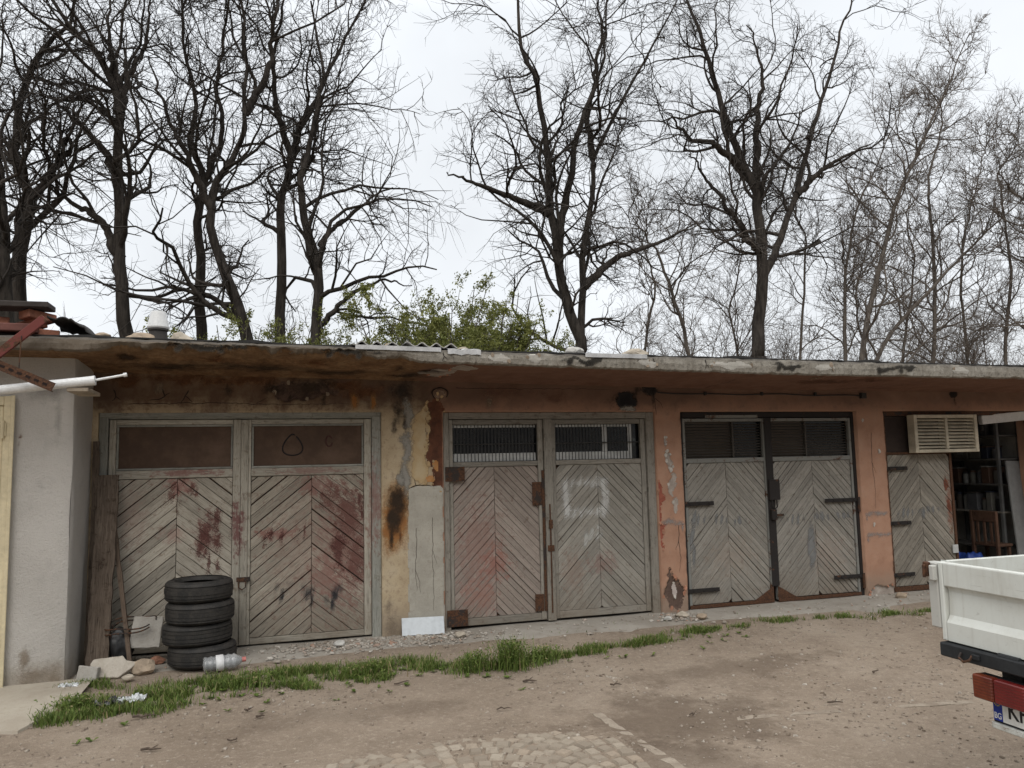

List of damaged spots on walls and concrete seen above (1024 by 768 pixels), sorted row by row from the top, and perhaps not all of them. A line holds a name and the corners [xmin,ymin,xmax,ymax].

leakage [152,341,382,401]
peeling [657,436,678,551]
flaking render [662,567,687,612]